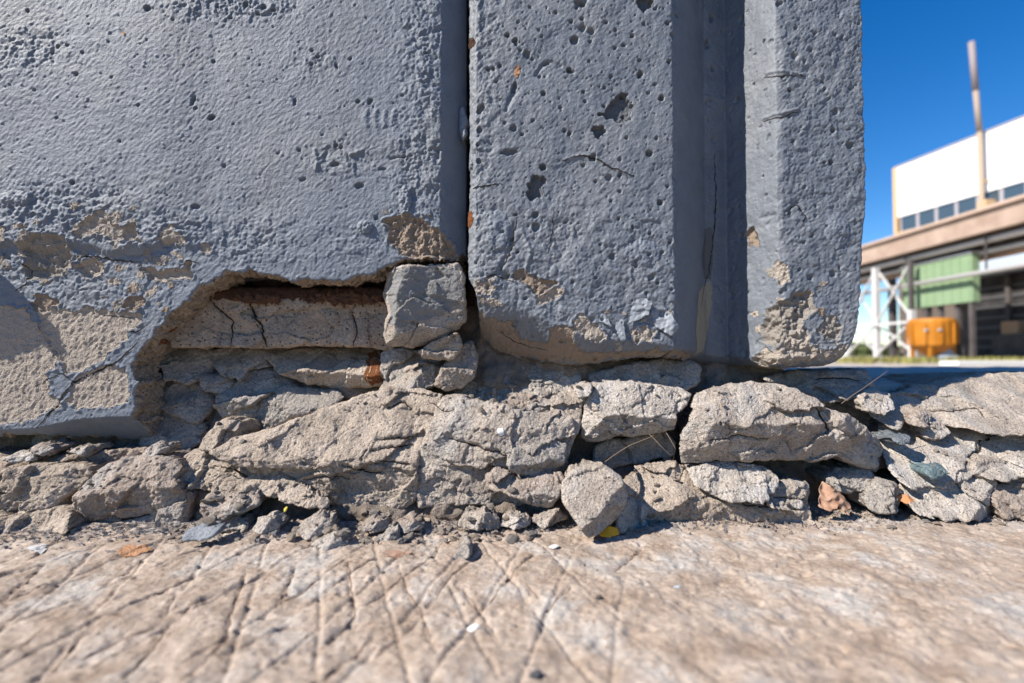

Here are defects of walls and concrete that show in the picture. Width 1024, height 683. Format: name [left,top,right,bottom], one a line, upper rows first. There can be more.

crack [562,155,634,176]
crack [700,154,717,307]
spalling [745,227,760,247]
spalling [0,202,469,464]
crack [213,302,267,346]
peeling [512,268,564,305]
peeling [473,276,709,365]
spalling [735,260,847,369]